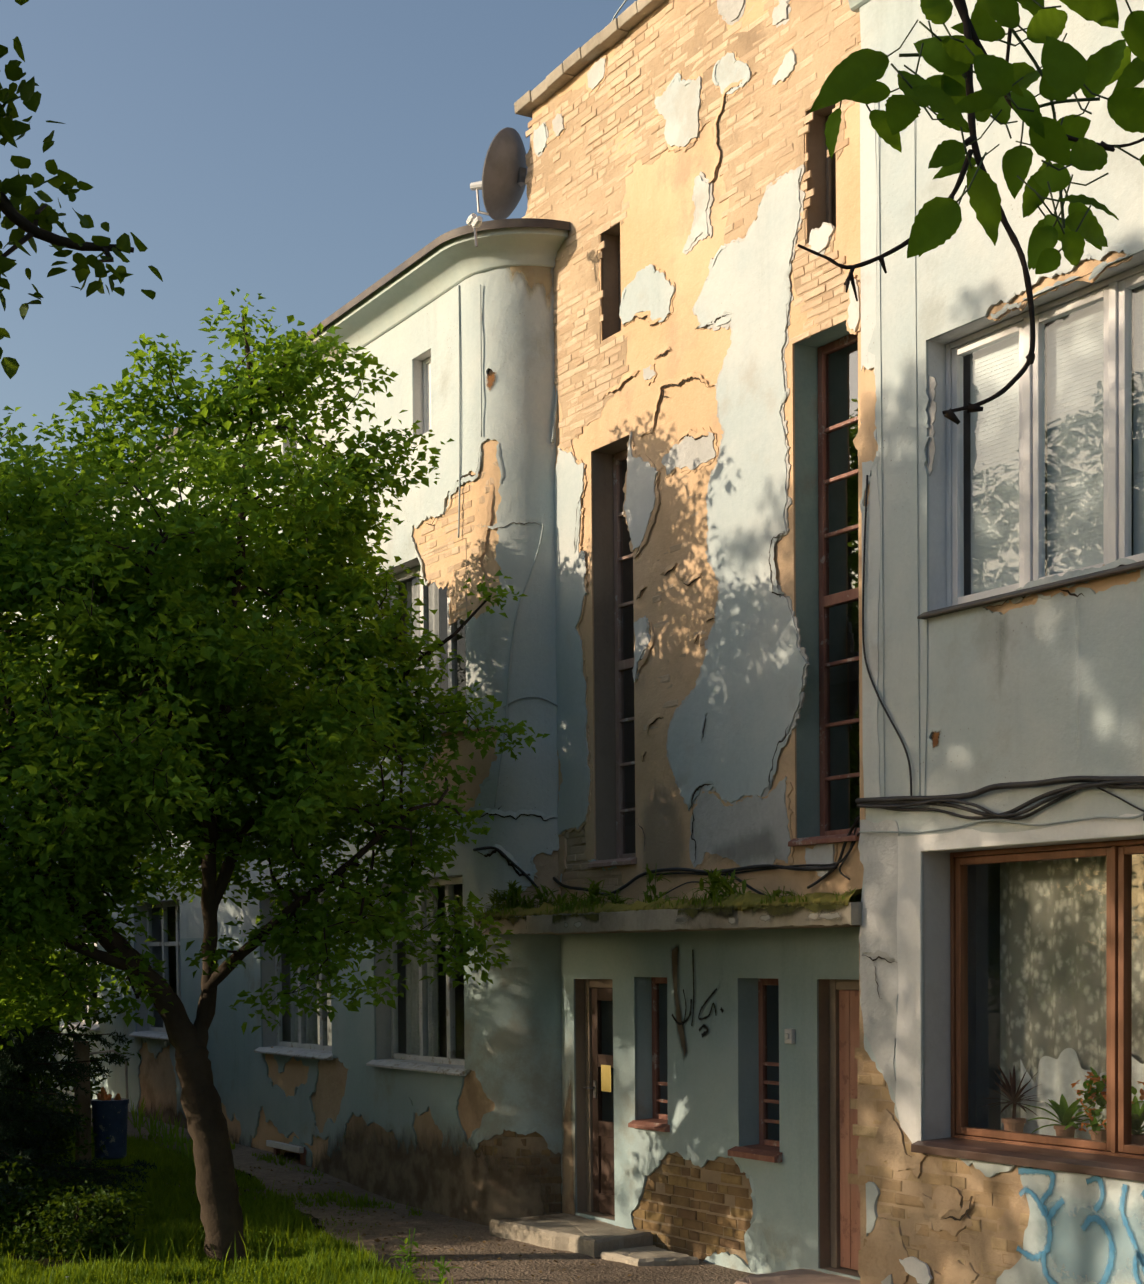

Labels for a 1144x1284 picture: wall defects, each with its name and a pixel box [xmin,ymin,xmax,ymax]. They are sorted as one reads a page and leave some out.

crack [709,72,757,184]
spalling [986,243,1133,321]
spalling [500,0,861,910]
spalling [853,366,880,513]
spalling [922,376,938,476]
spalling [411,439,505,626]
spalling [221,1046,398,1168]
spalling [457,1070,562,1215]
spalling [632,1151,757,1265]
spalling [848,1040,1030,1284]